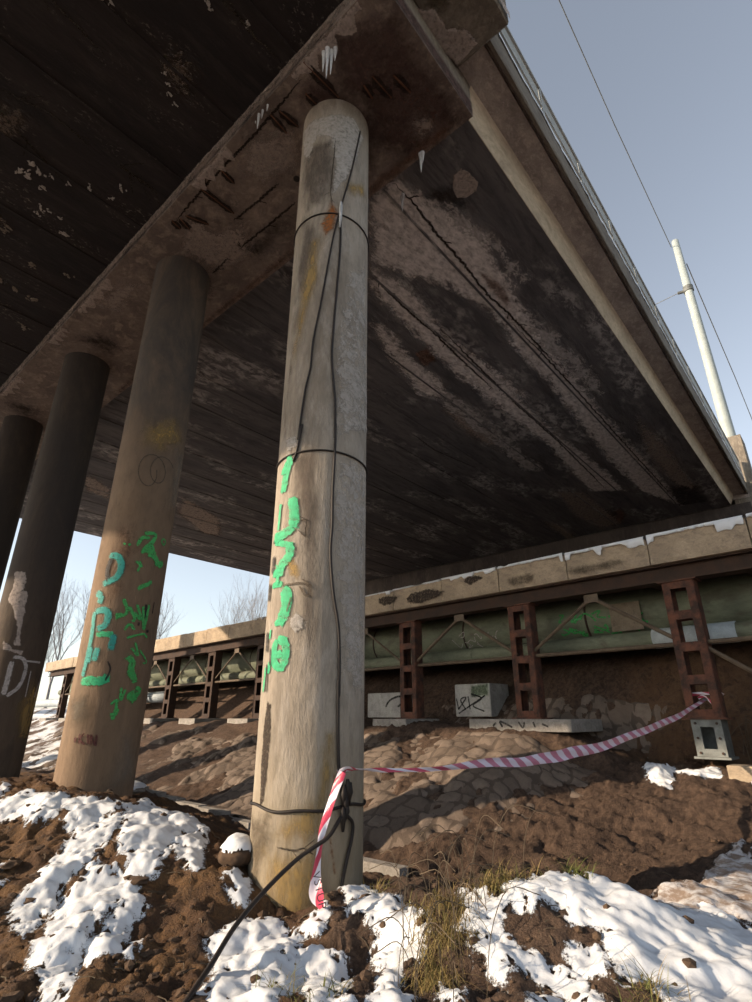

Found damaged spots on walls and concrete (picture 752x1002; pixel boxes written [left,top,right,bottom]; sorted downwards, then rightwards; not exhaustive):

spalling [453,168,478,198]
damp [350,179,694,526]
crack [378,183,674,504]